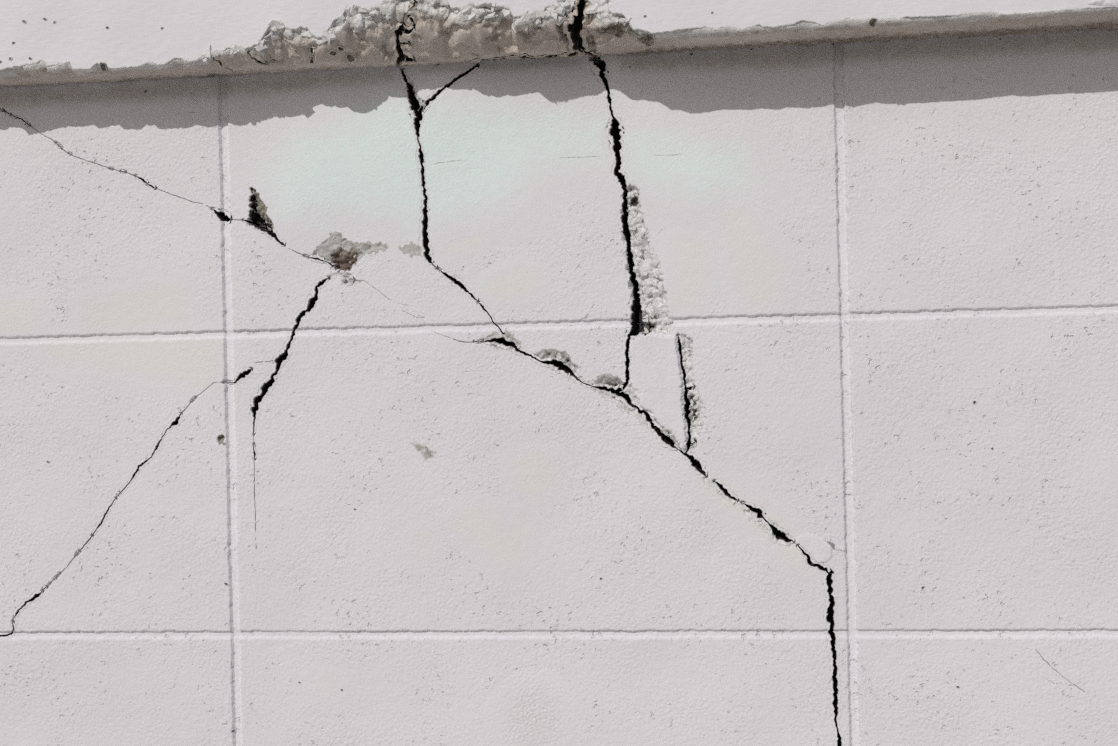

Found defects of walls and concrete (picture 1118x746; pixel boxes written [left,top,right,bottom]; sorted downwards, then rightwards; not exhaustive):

spalling [0,0,1118,81]
spalling [249,187,274,229]
spalling [311,232,422,286]
spalling [629,183,707,450]
crack [0,0,845,746]